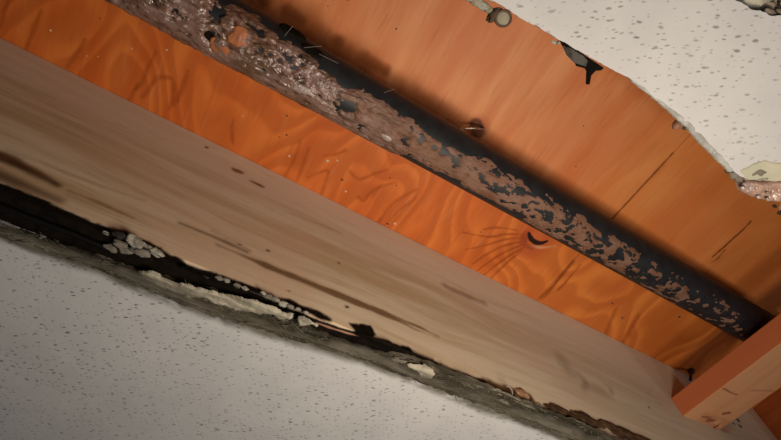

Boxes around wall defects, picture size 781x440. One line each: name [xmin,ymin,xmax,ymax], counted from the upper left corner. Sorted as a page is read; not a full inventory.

spalling [740,160,781,182]
leakage [0,173,438,365]
peeling [138,270,318,327]
leakage [449,368,533,401]